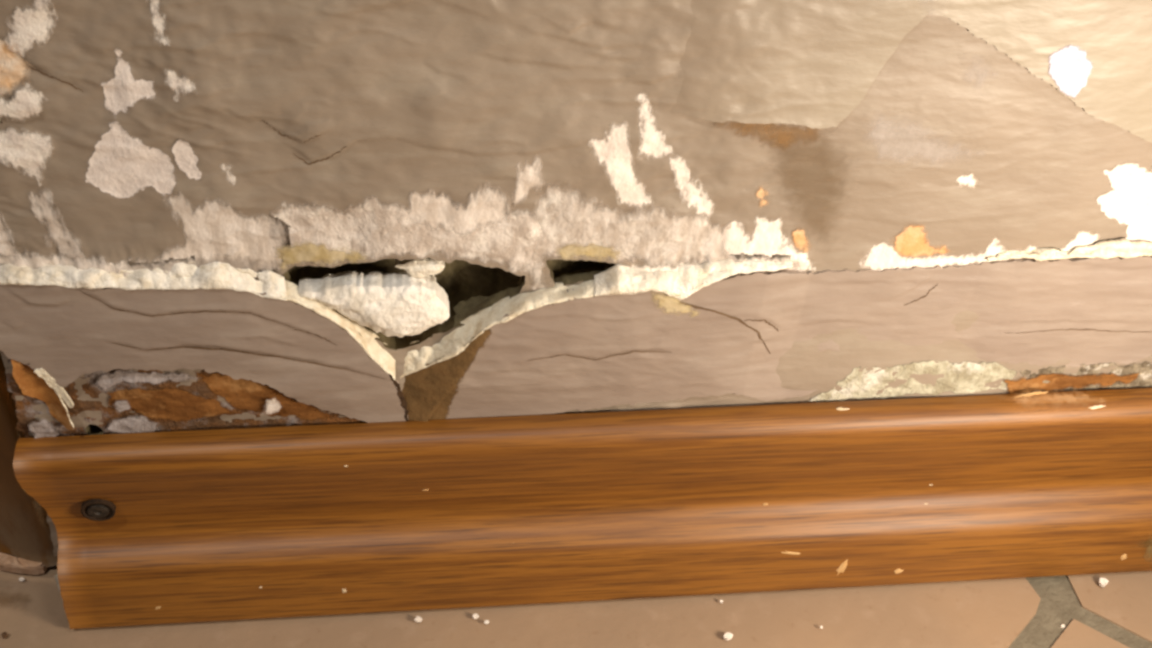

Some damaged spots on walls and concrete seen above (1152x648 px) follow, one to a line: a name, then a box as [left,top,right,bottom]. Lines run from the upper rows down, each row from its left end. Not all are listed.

peeling [670,0,1152,143]
flaking render [0,0,816,319]
peeling [860,225,1037,271]
peeling [956,174,976,187]
peeling [1061,231,1098,252]
peeling [1097,163,1152,242]
flaking render [5,359,366,439]